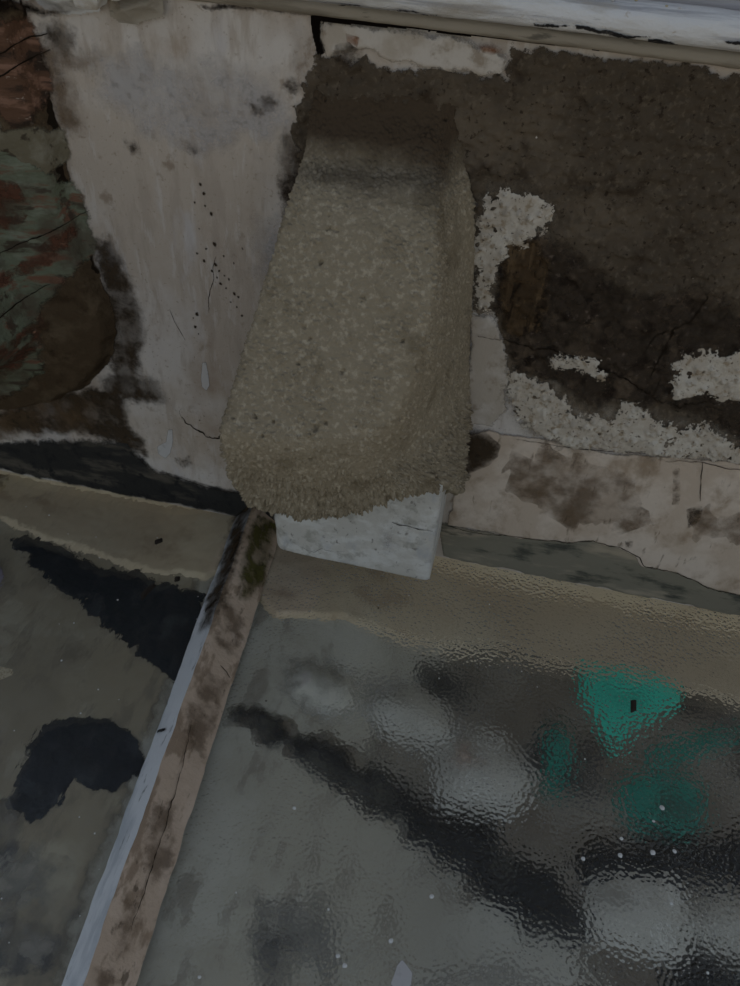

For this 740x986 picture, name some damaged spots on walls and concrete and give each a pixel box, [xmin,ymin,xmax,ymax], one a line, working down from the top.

peeling [0,152,97,399]
peeling [473,187,555,314]
leakage [0,241,161,456]
peeling [548,351,607,382]
peeling [668,347,740,405]
crack [179,411,220,439]
leakage [466,432,500,474]
leakage [511,451,597,528]
peeling [504,369,740,464]